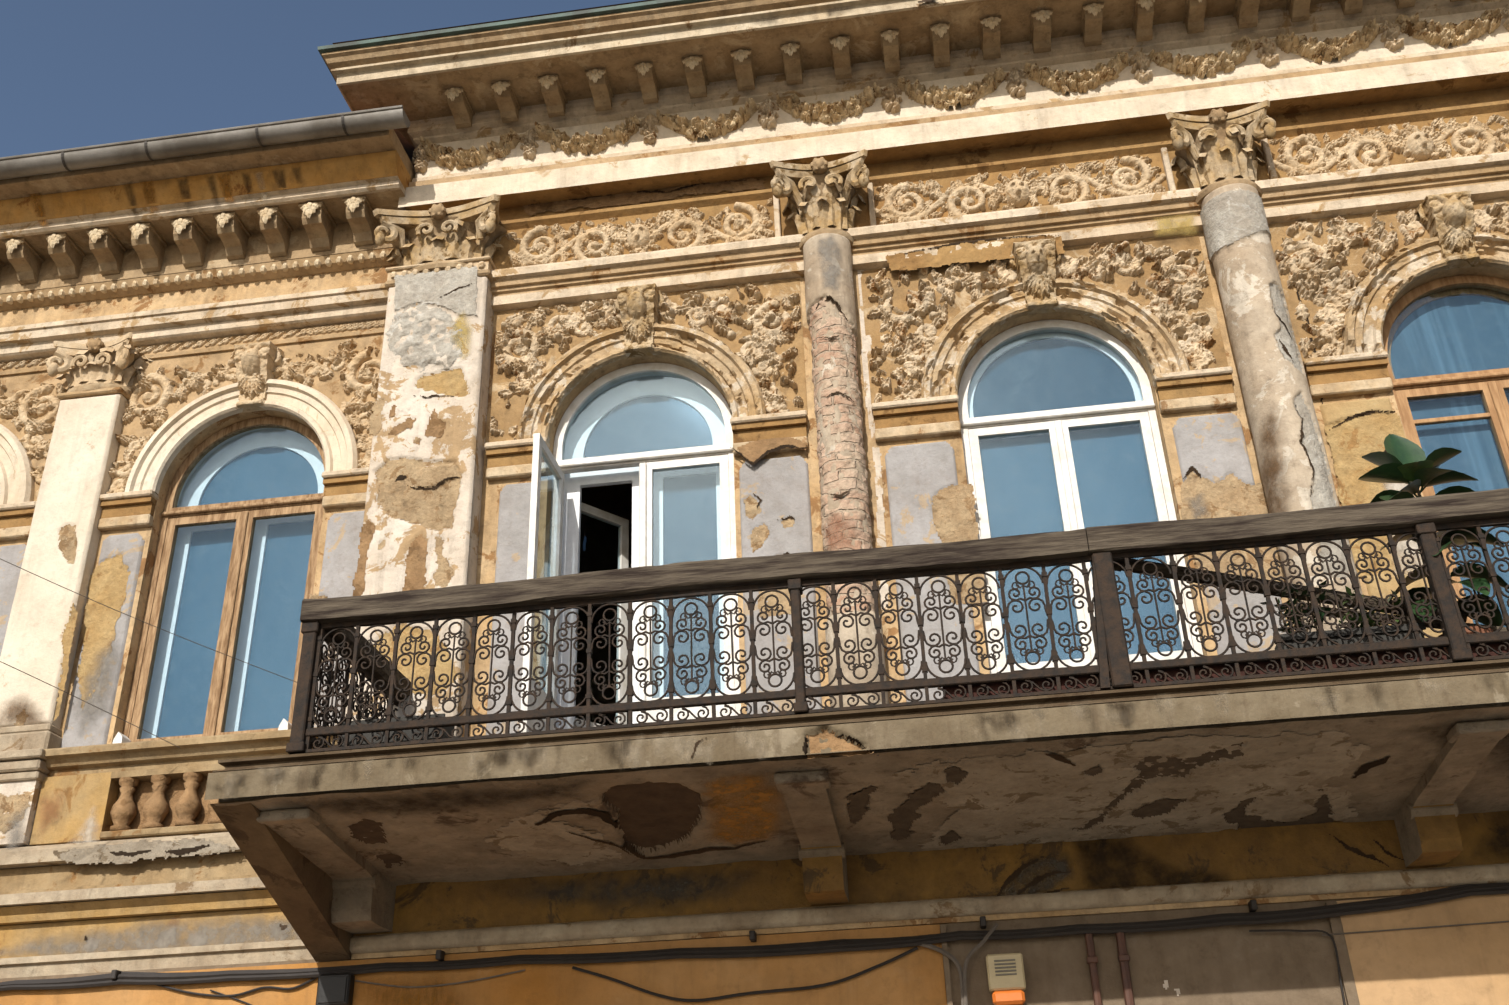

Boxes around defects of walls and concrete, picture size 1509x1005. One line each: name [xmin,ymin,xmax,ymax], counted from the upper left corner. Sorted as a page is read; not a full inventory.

spalling [886,235,1065,271]
crack [1282,238,1316,353]
flaking render [730,269,886,552]
flaking render [352,368,470,596]
peeling [931,484,979,543]
flaking render [58,524,77,564]
peeling [757,589,791,618]
flaking render [825,580,889,620]
peeling [945,574,987,605]
flaking render [53,554,131,728]
spalling [535,781,765,860]
flaking render [53,837,239,865]